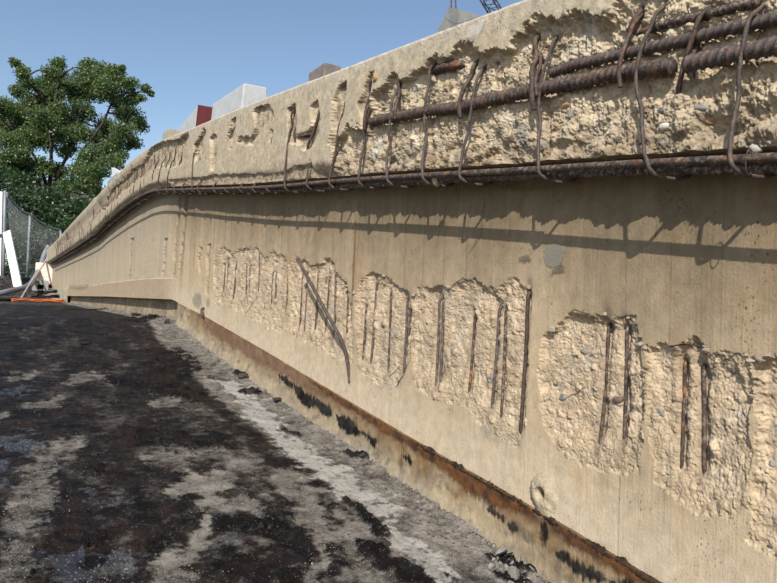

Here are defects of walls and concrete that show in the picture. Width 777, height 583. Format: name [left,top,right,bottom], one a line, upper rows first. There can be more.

spalling [49,0,777,279]
corrosion [204,318,534,516]
spalling [198,244,777,563]